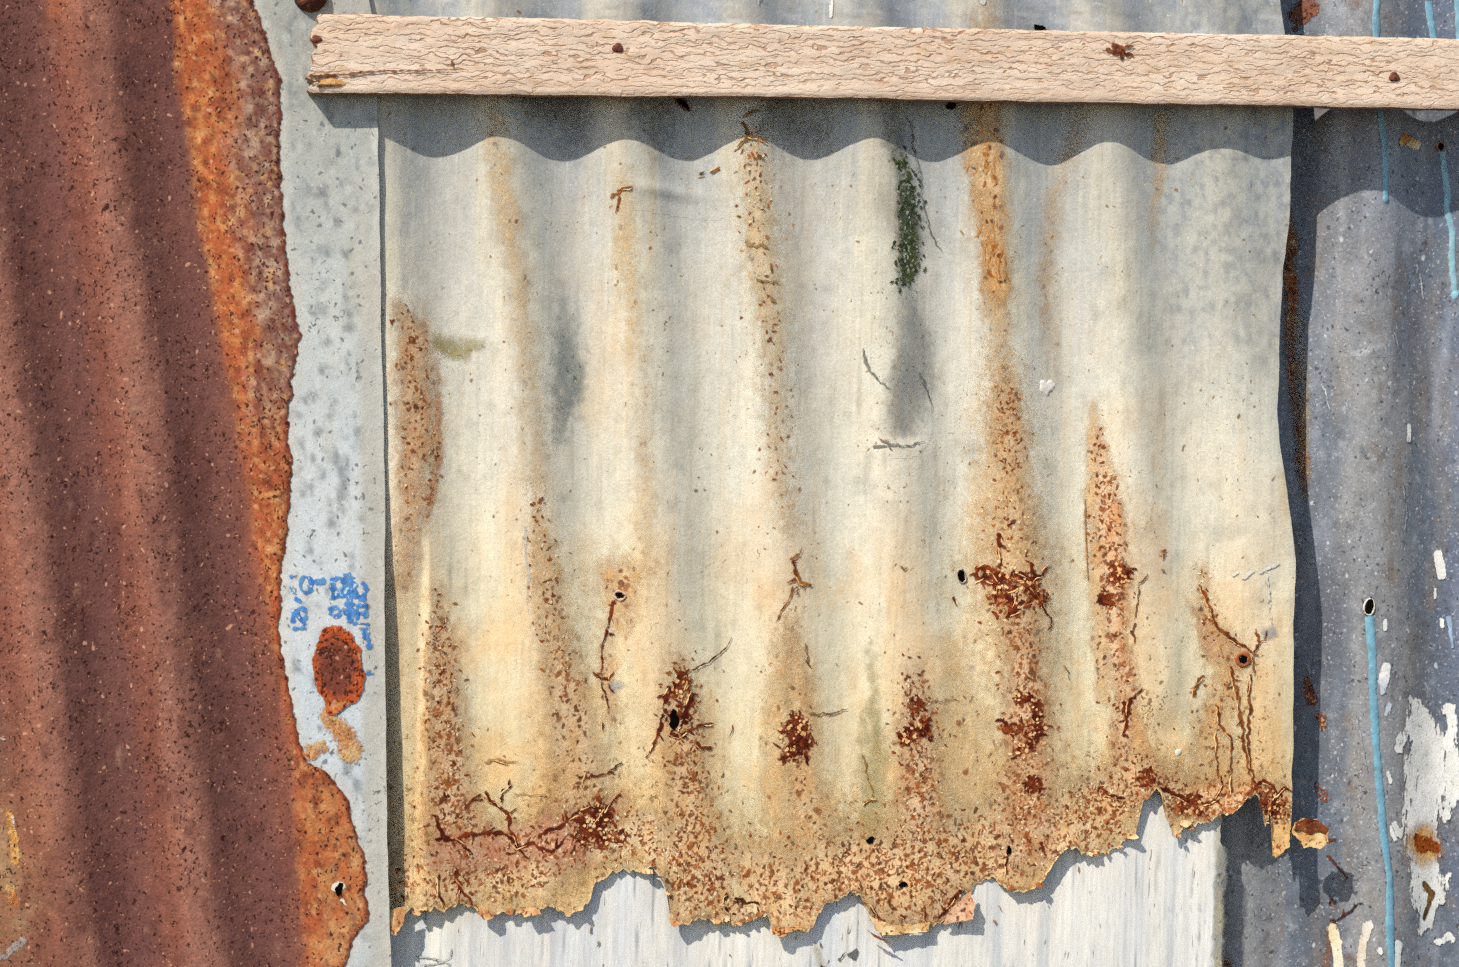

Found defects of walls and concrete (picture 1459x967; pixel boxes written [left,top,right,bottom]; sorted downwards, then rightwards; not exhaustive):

rust [0,0,369,967]
rust [387,102,1329,937]
rust [1409,826,1440,920]